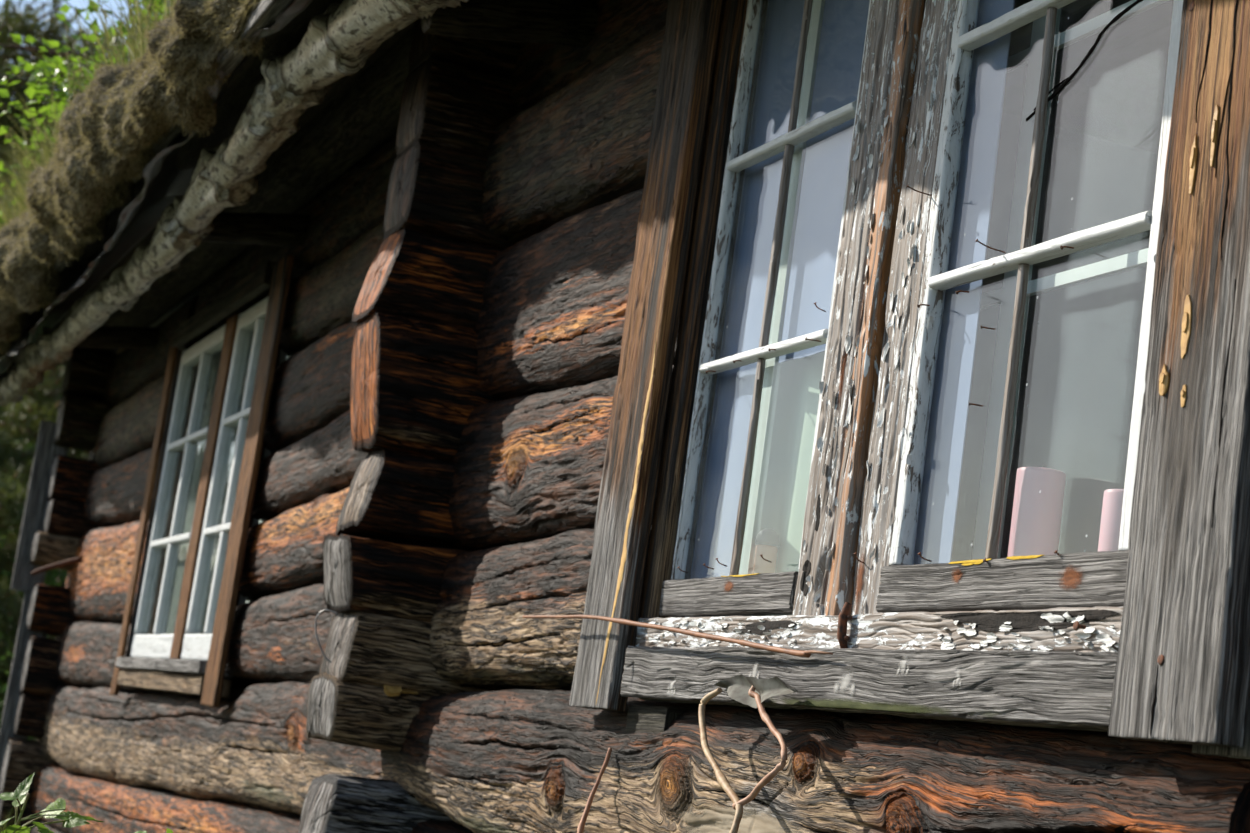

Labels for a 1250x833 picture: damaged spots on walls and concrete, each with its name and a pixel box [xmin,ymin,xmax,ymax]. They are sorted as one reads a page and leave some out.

peeling [851,115,889,195]
peeling [864,212,874,284]
peeling [883,204,921,371]
peeling [817,335,860,476]
peeling [806,575,824,615]
peeling [937,612,1120,653]
crack [702,783,827,833]
crack [929,824,1137,833]